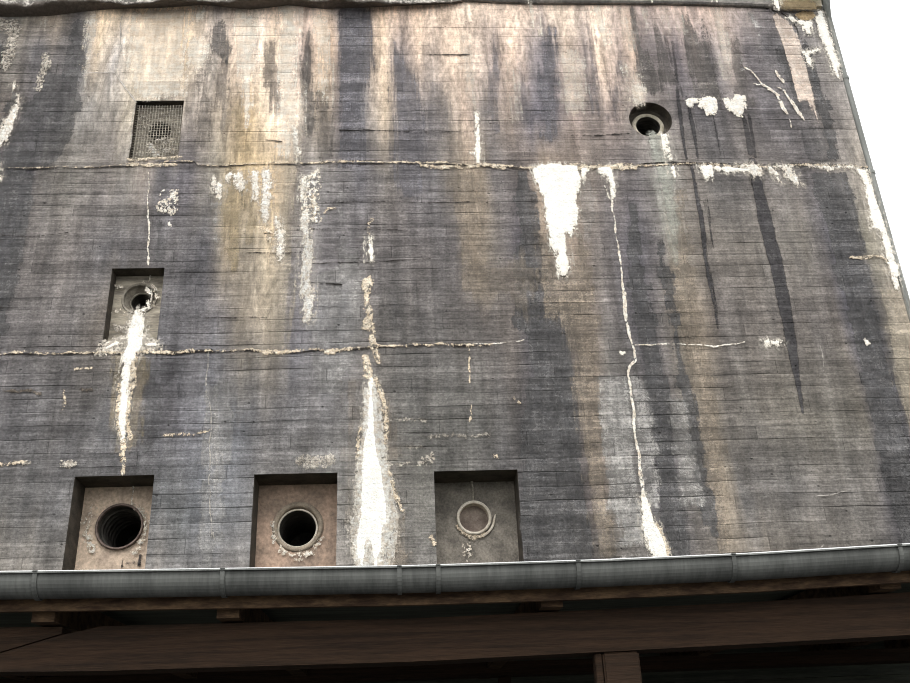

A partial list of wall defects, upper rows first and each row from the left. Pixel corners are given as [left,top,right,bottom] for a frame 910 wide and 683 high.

leakage [0,14,96,338]
efflorescence [106,307,160,474]
leakage [126,5,375,324]
crack [0,339,524,539]
crack [3,16,535,285]
leakage [388,42,426,197]
leakage [511,162,616,561]
leakage [620,6,721,329]
crack [562,161,868,557]
crack [744,67,804,128]
leakage [735,0,910,544]